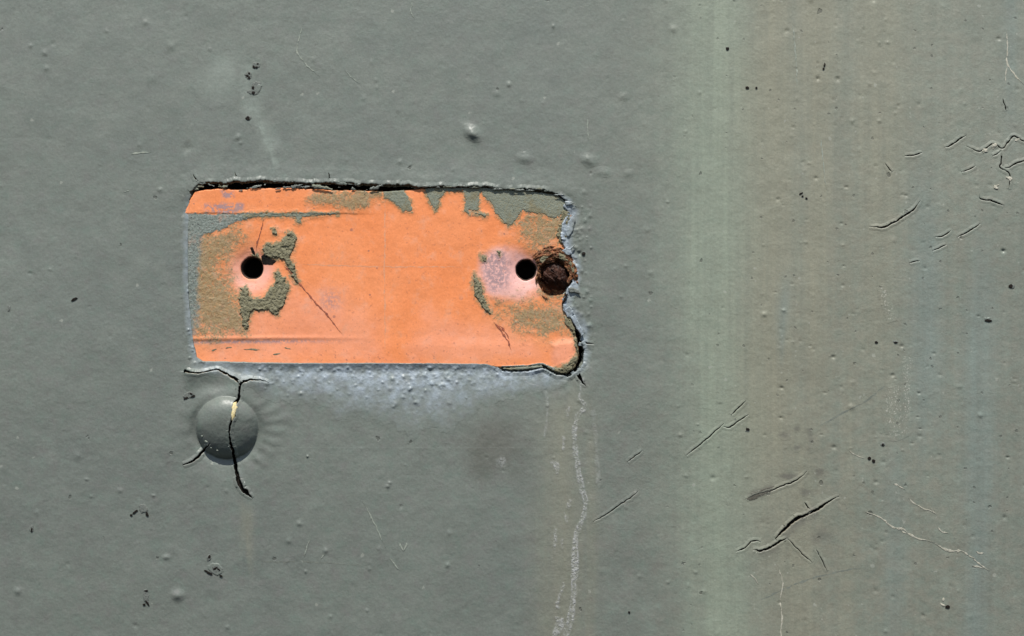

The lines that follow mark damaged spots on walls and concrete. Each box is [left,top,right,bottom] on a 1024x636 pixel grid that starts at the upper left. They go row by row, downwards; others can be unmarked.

peeling [185,179,586,374]
crack [869,199,923,232]
crack [883,97,1024,266]
crack [182,366,270,500]
water stain [179,192,602,636]
crack [685,399,750,458]
crack [592,489,640,524]
crack [735,469,840,573]